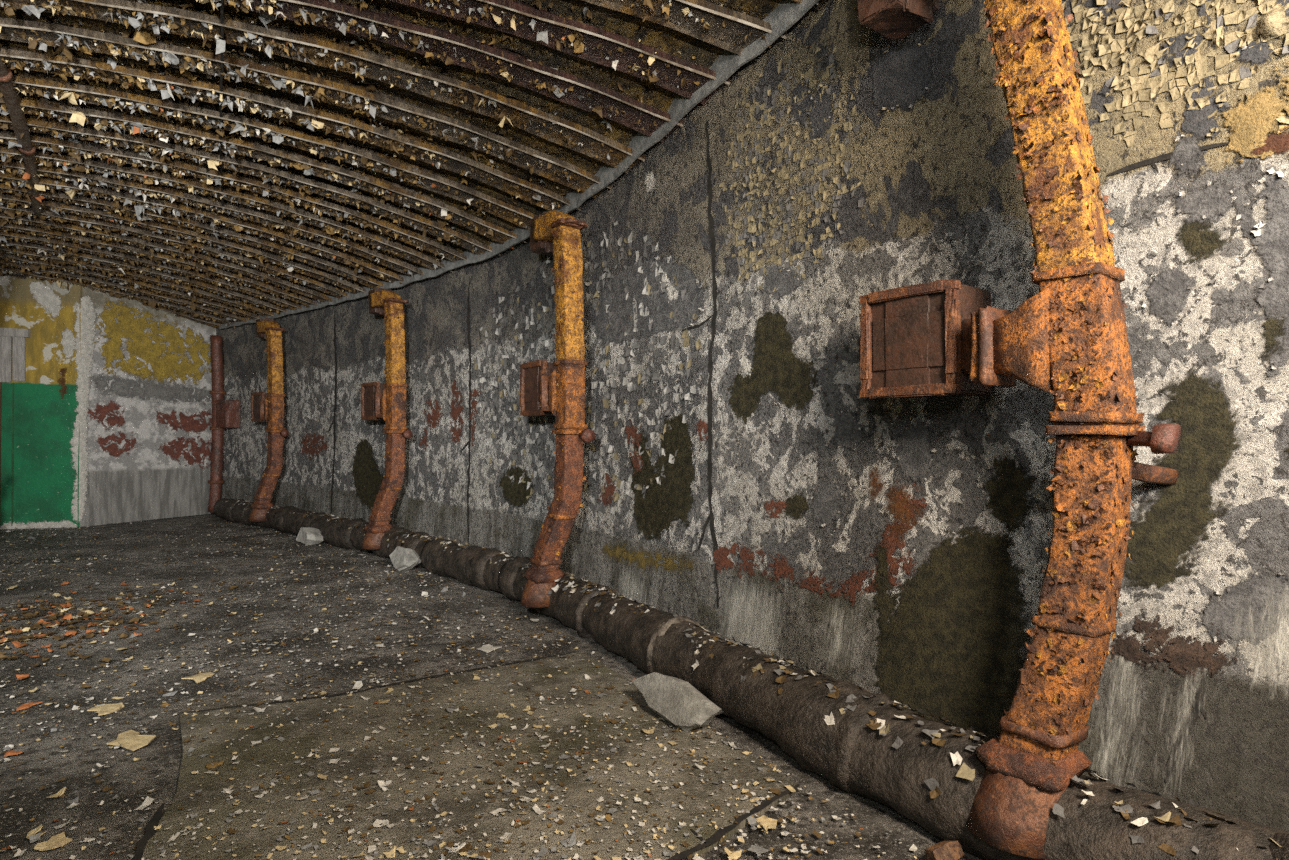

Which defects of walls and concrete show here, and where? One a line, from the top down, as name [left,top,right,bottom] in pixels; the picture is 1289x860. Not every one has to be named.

peeling [622,0,746,37]
peeling [719,46,866,299]
peeling [1062,0,1289,377]
peeling [0,0,705,529]
peeling [739,350,752,377]
damp [728,310,818,428]
damp [352,439,384,510]
damp [499,466,533,507]
damp [630,413,697,540]
damp [1125,367,1241,589]
damp [873,451,1036,738]
crack [667,784,800,860]